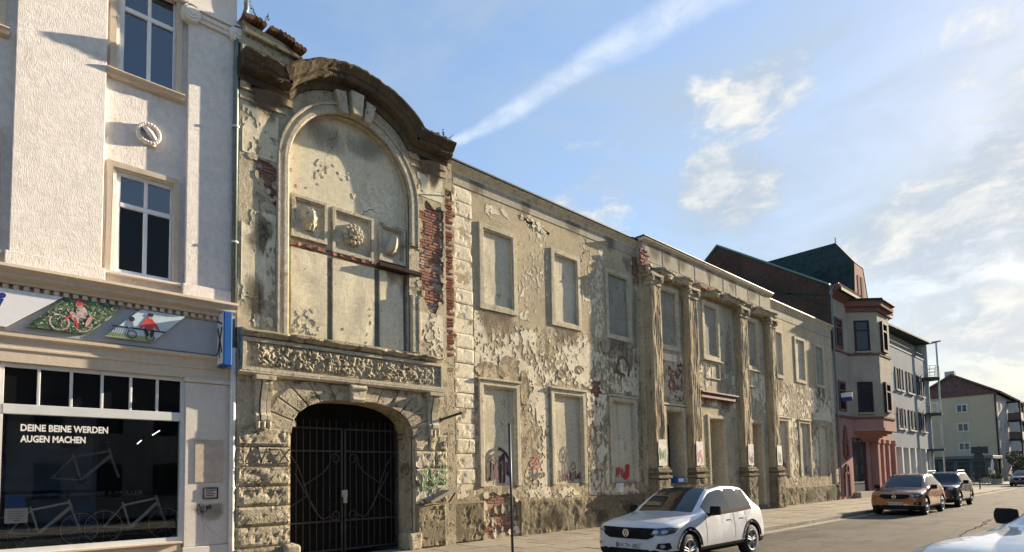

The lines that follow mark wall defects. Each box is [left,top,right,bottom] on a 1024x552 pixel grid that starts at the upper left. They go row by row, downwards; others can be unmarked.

peeling [241,104,279,327]
flaking render [416,172,457,357]
peeling [474,203,640,539]
peeling [779,383,832,485]